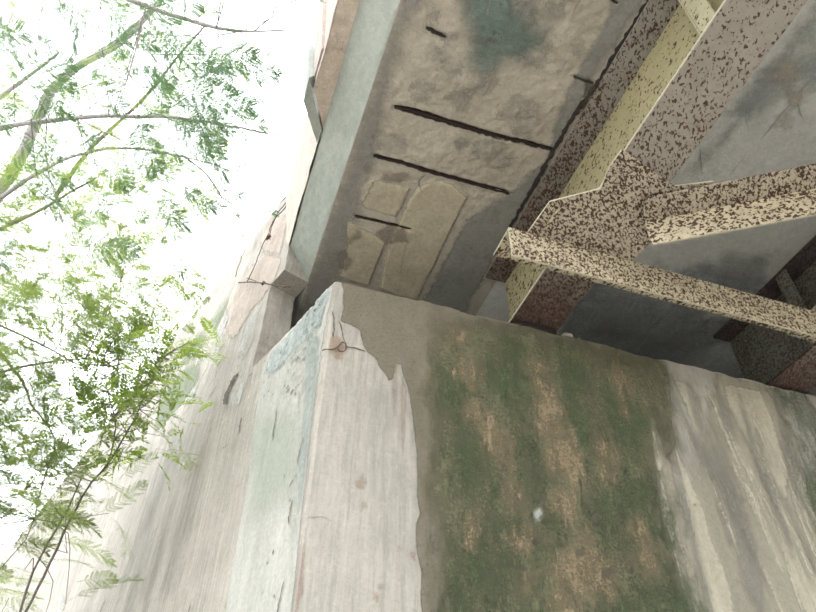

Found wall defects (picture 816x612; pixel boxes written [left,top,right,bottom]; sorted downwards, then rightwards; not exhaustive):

crack [336,244,391,295]
crack [396,175,425,218]
peeling [340,154,509,299]
crack [419,199,467,296]
water stain [226,0,816,612]